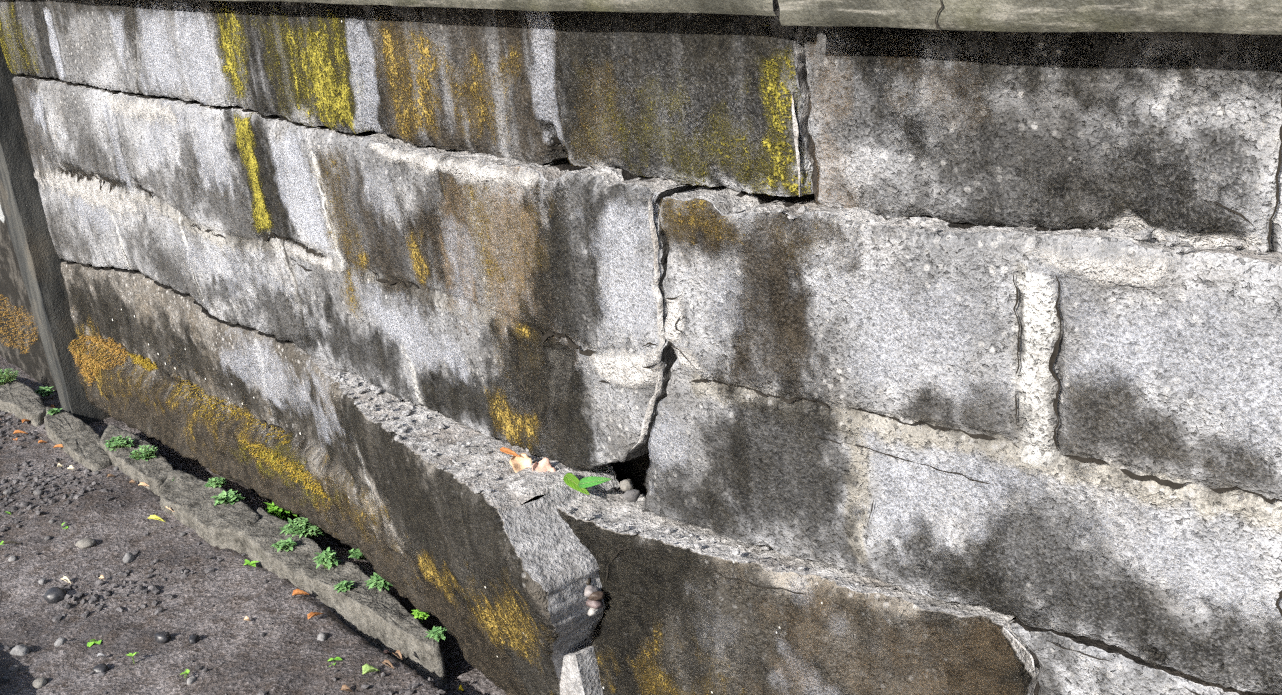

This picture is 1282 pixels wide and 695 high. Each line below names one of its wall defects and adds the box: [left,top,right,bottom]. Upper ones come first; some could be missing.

leakage [440,46,520,140]
leakage [854,26,1041,96]
leakage [1058,32,1135,112]
leakage [1153,59,1195,77]
leakage [1239,37,1282,91]
leakage [273,135,326,243]
crack [1207,96,1282,253]
crack [530,192,1282,504]
leakage [902,388,1001,436]
leakage [1062,369,1274,488]
crack [605,546,809,595]
crack [1274,557,1282,616]